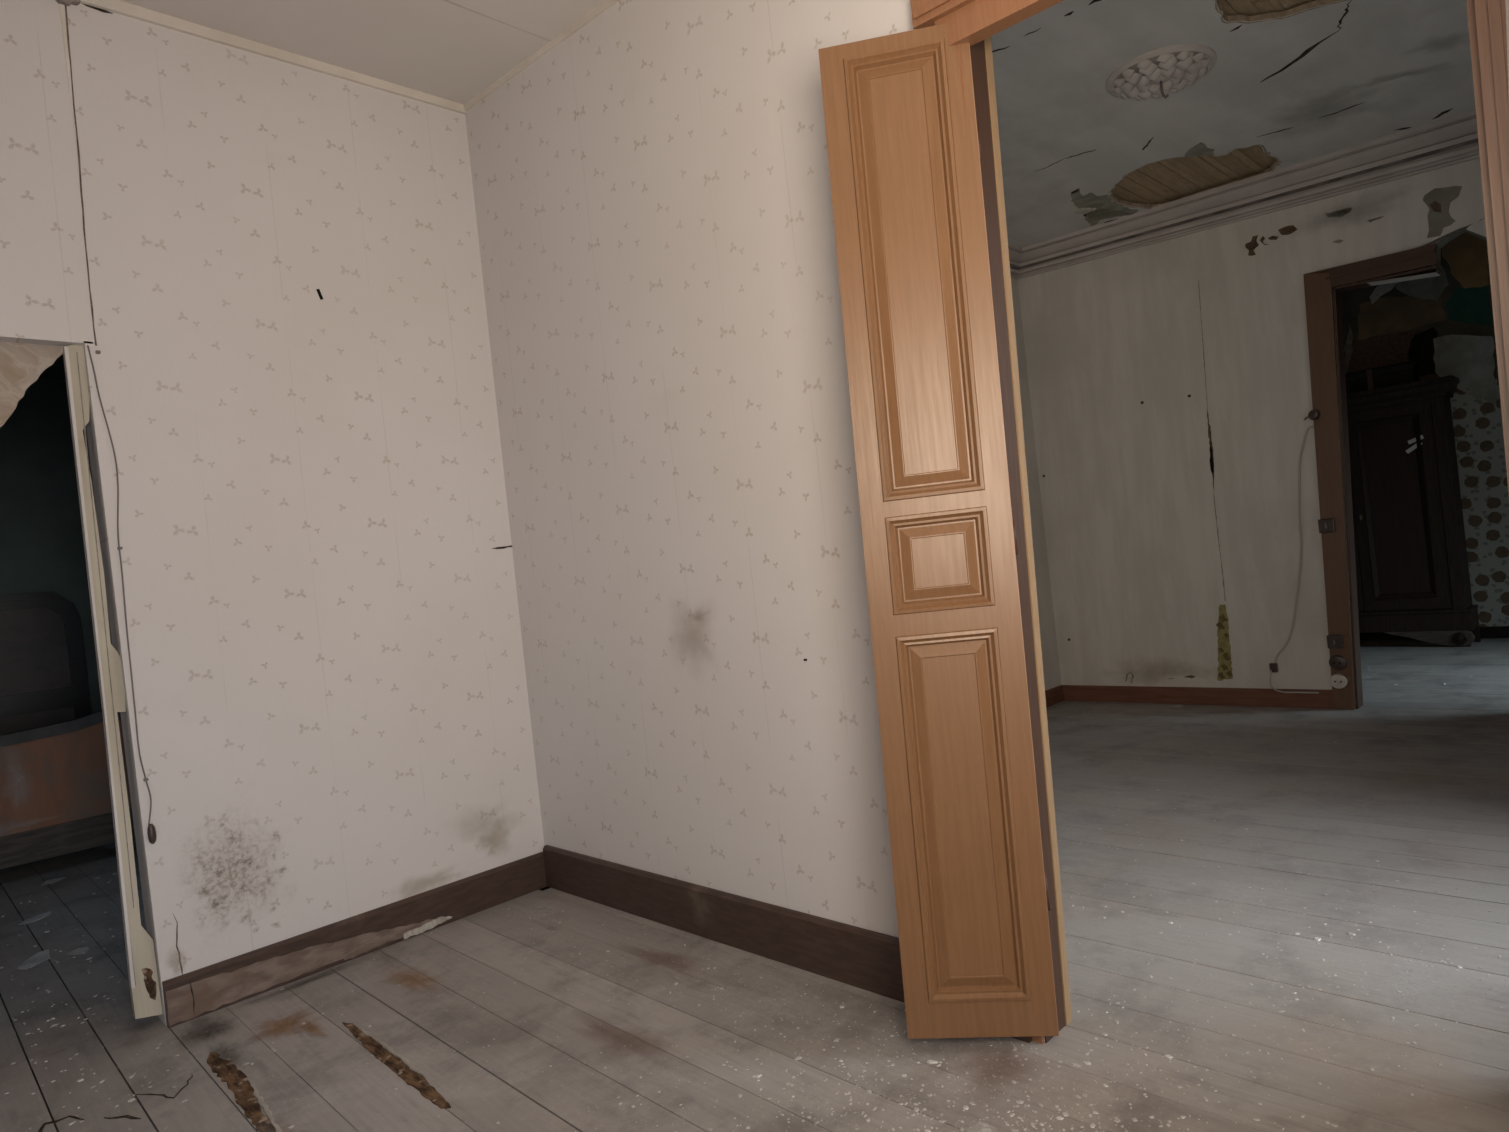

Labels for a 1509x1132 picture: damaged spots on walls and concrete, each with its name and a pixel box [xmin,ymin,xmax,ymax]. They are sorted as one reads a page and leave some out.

spalling [1215,0,1347,24]
crack [1261,0,1352,82]
flaking render [1070,188,1139,226]
peeling [1245,225,1298,256]
flaking render [1423,186,1489,288]